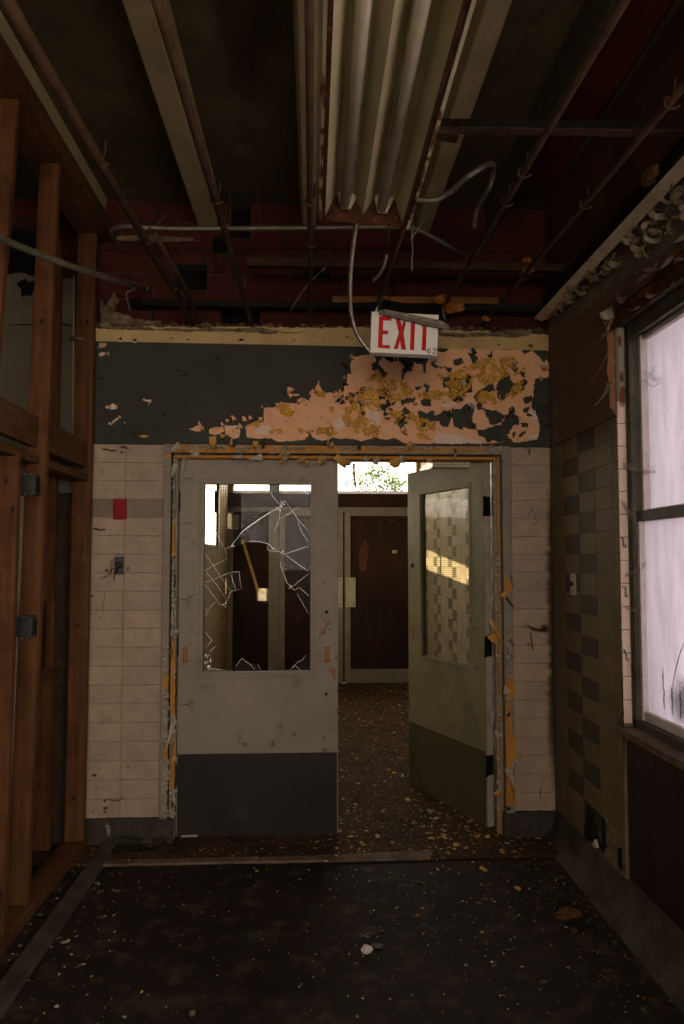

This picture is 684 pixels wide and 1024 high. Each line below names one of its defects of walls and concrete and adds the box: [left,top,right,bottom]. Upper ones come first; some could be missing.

spalling [8,233,36,276]
spalling [215,210,250,253]
peeling [543,182,684,323]
spalling [98,310,305,357]
peeling [161,330,549,819]
spalling [584,805,624,876]